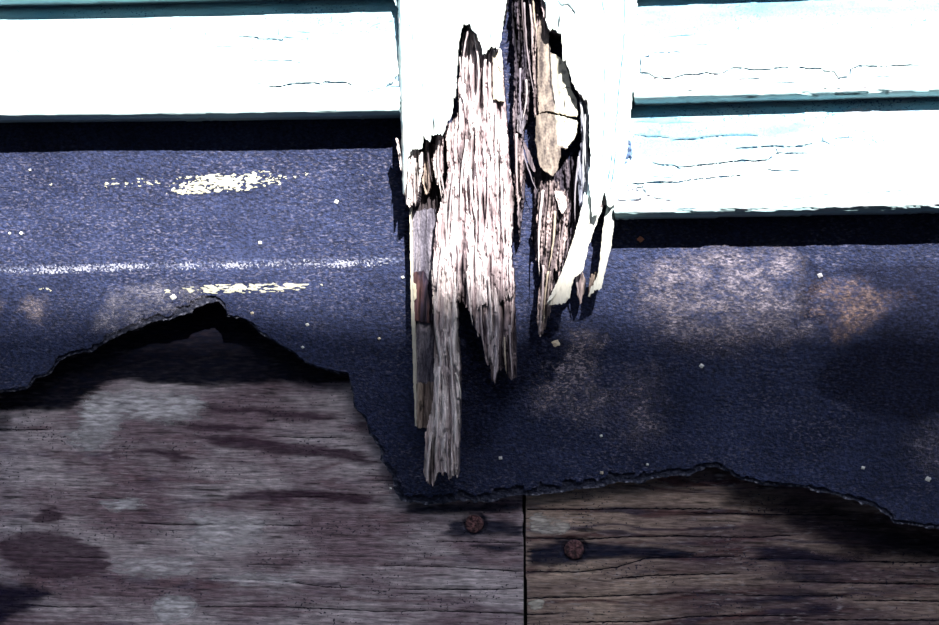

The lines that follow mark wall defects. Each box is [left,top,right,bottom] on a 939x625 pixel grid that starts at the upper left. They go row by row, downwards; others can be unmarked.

crack [209,29,370,88]
peeling [493,48,504,102]
crack [545,0,576,112]
crack [602,0,938,200]
damp [644,254,827,345]
damp [818,266,939,421]
damp [138,450,195,459]
damp [151,420,381,464]
damp [206,405,336,420]
damp [228,490,377,504]
damp [0,507,111,623]